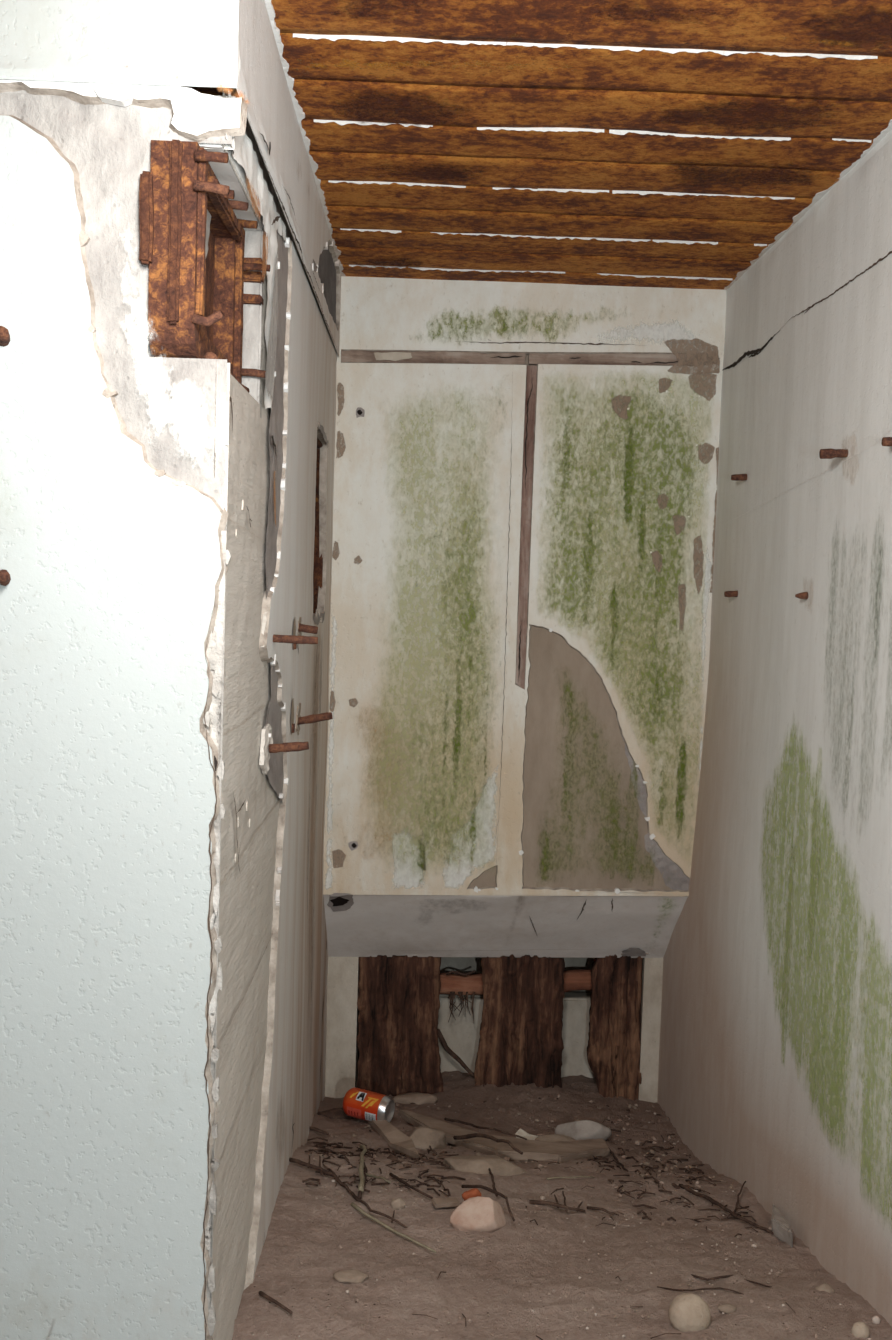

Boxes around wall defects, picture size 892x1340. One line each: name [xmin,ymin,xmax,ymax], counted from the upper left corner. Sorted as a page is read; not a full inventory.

corrosion [246,180,260,217]
spalling [312,241,340,324]
peeling [659,338,723,401]
crack [723,251,892,370]
water stain [624,428,661,569]
water stain [701,549,712,680]
spalling [0,90,291,1340]
water stain [384,830,424,889]
water stain [443,661,471,772]
water stain [443,756,497,888]
spalling [519,625,690,894]
water stain [658,727,703,837]